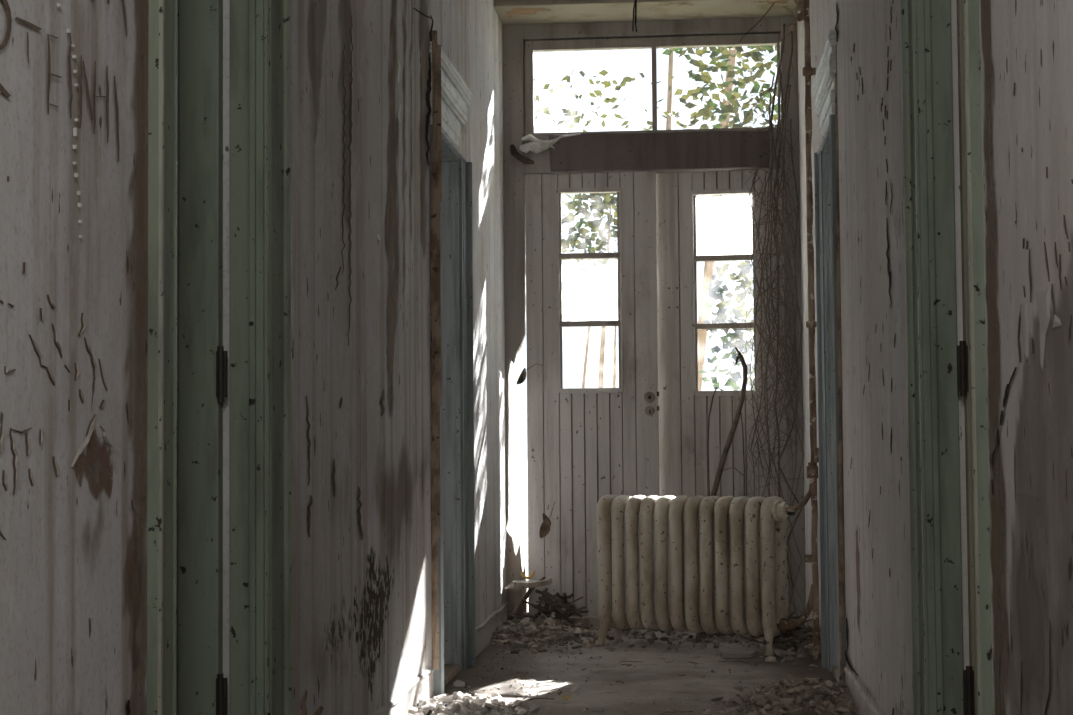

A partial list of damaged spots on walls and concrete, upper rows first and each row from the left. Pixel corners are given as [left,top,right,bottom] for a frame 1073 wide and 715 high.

peeling [881,0,894,145]
peeling [0,426,43,495]
peeling [29,335,56,385]
peeling [40,295,84,411]
spalling [53,313,117,498]
peeling [1017,215,1070,372]